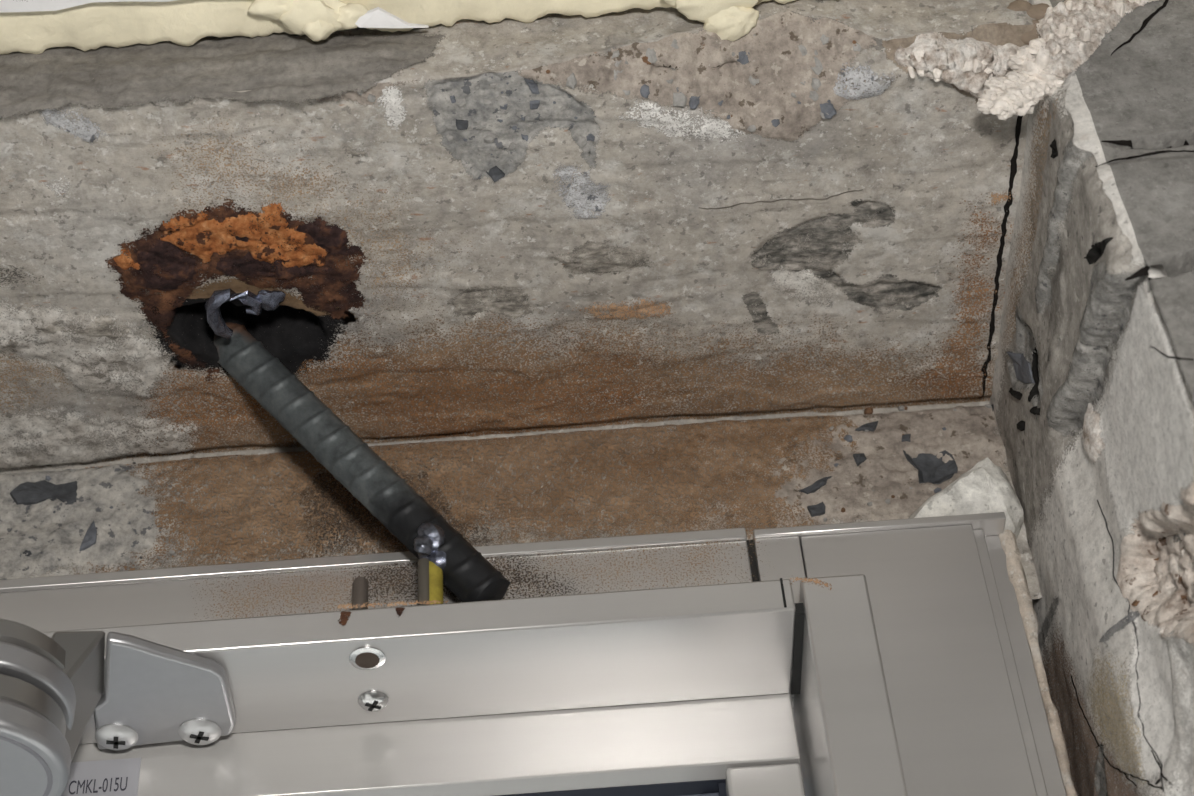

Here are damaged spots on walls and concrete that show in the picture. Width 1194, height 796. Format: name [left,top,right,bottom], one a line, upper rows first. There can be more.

crack [1111,0,1169,55]
corrosion [69,111,474,625]
corrosion [368,191,1014,599]
spalling [316,0,1194,796]
crack [979,115,1023,398]
crack [1071,500,1193,796]